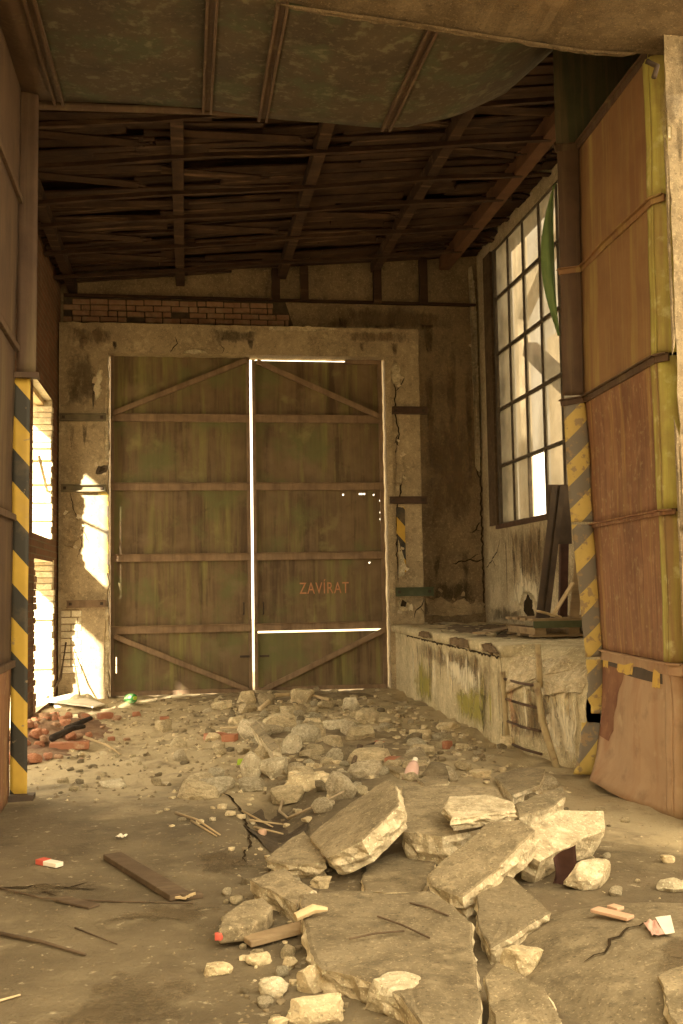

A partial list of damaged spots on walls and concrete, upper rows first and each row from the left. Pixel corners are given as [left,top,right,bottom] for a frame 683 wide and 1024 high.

damp [71,328,115,405]
crack [394,376,405,570]
crack [453,457,500,607]
spalling [33,560,82,714]
hole [519,582,537,622]
damp [412,645,500,724]
crack [224,793,252,862]